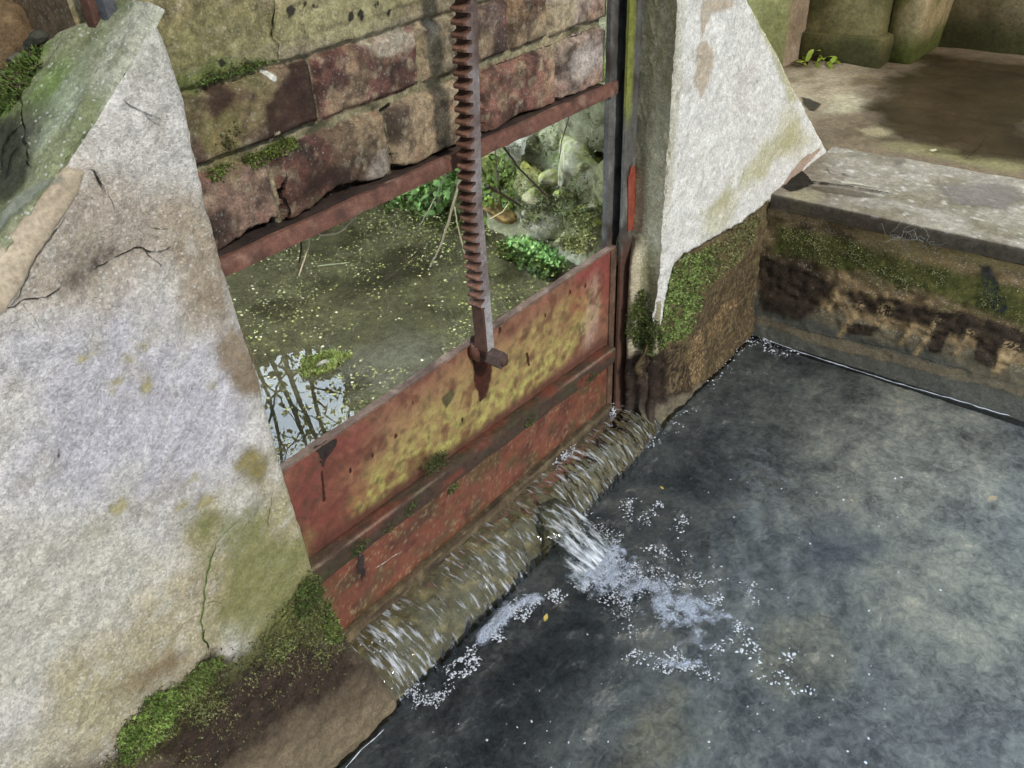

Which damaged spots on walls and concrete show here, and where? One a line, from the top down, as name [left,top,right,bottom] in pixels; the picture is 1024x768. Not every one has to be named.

crack [124,100,162,124]
crack [90,169,115,210]
crack [95,225,171,269]
crack [7,287,60,330]
rust [442,391,454,407]
rust [473,360,492,402]
crack [200,522,236,664]